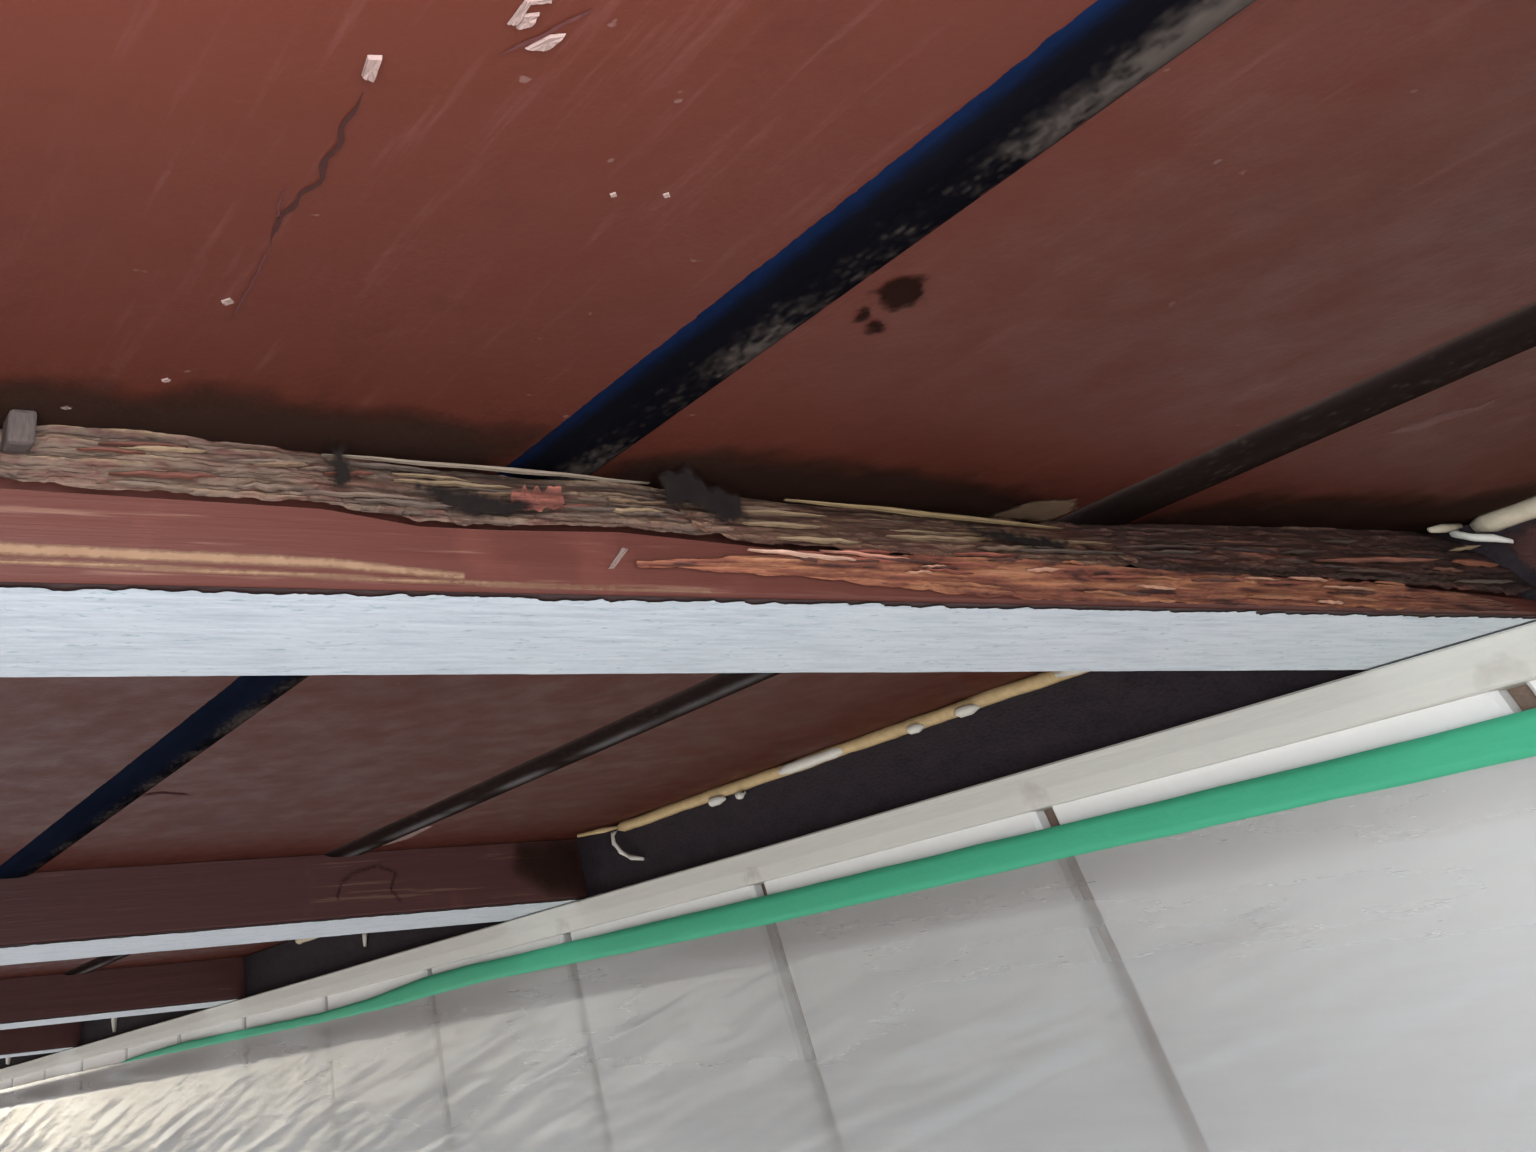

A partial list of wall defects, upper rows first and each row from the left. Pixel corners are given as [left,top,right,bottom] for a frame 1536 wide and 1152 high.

peeling [507,0,566,51]
crack [230,92,363,321]
leakage [855,277,924,335]
peeling [0,543,496,584]
peeling [636,549,1517,611]